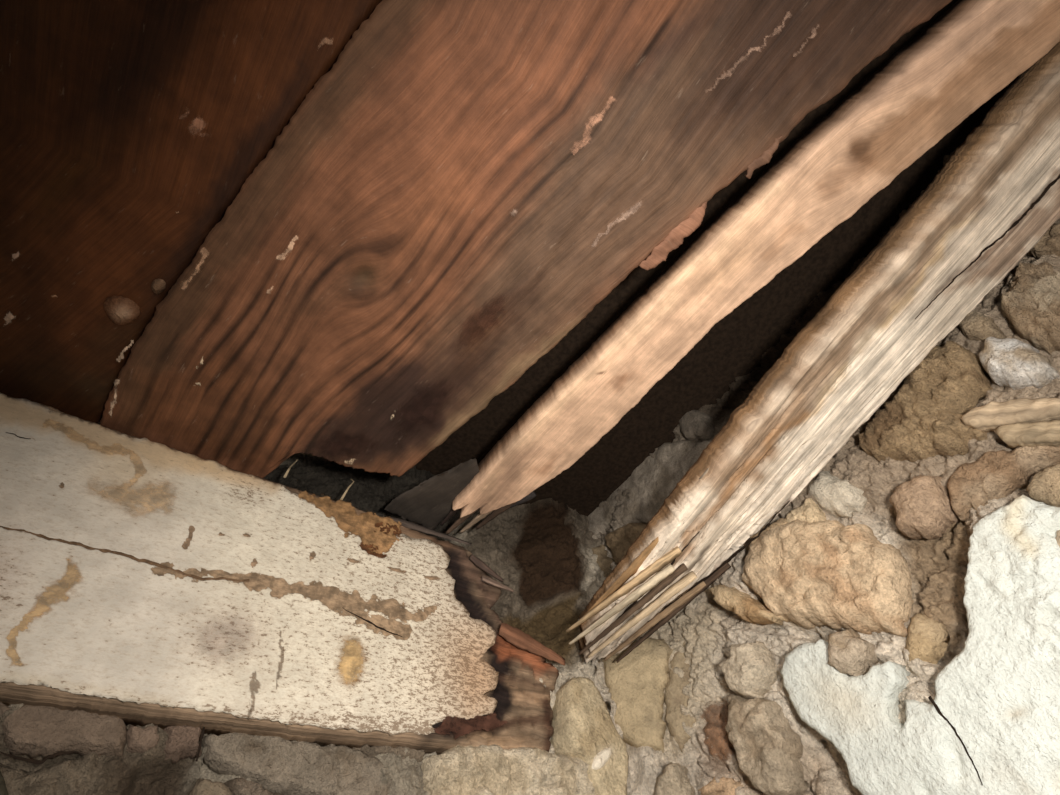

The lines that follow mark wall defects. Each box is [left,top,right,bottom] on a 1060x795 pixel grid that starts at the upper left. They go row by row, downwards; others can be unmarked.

crack [0,526,437,640]
crack [928,696,983,785]